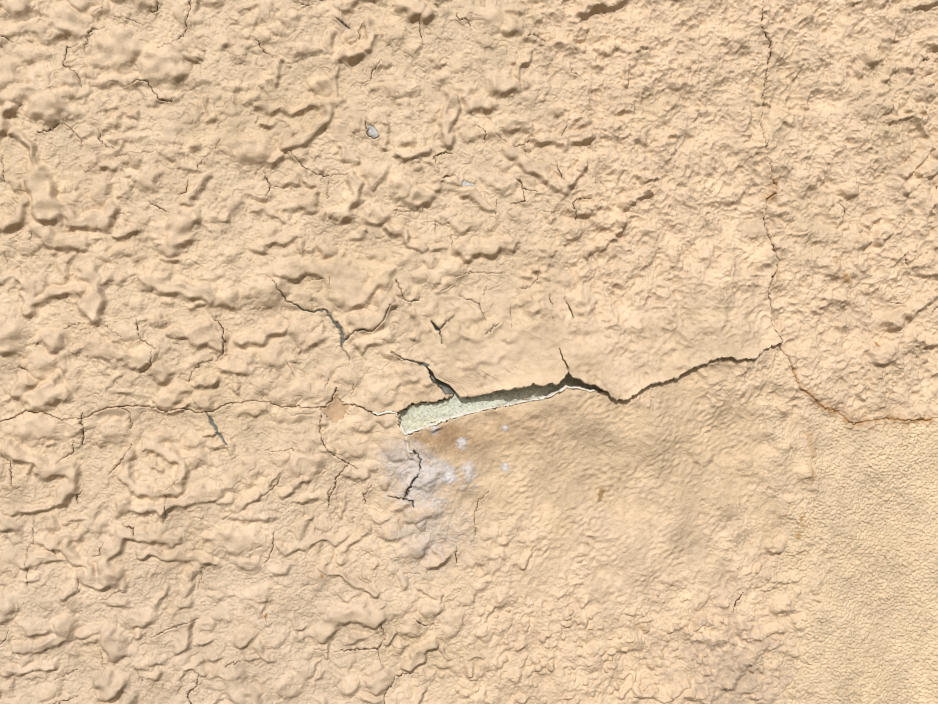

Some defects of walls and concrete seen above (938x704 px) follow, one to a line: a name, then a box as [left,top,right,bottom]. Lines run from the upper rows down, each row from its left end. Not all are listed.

crack [760,1,928,425]
crack [64,320,155,374]
crack [189,320,226,381]
crack [275,281,420,361]
crack [391,352,429,368]
crack [431,271,573,344]
peeling [372,247,783,453]
crack [1,379,391,508]
crack [363,451,422,507]
efflorescence [389,447,474,509]